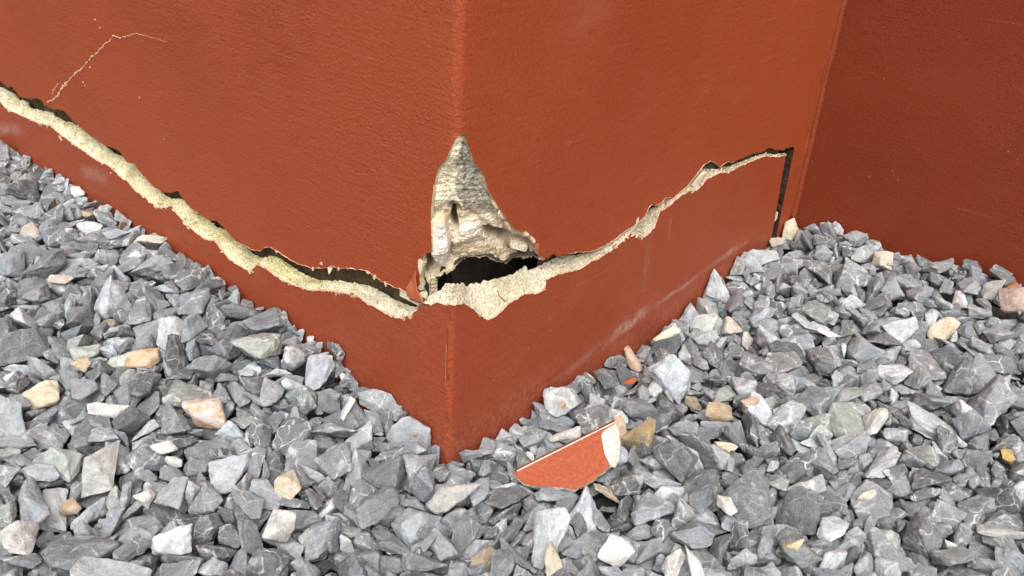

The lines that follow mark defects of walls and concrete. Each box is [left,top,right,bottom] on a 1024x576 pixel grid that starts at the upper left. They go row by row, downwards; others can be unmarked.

crack [0,19,430,321]
spalling [400,134,548,320]
crack [528,129,810,291]